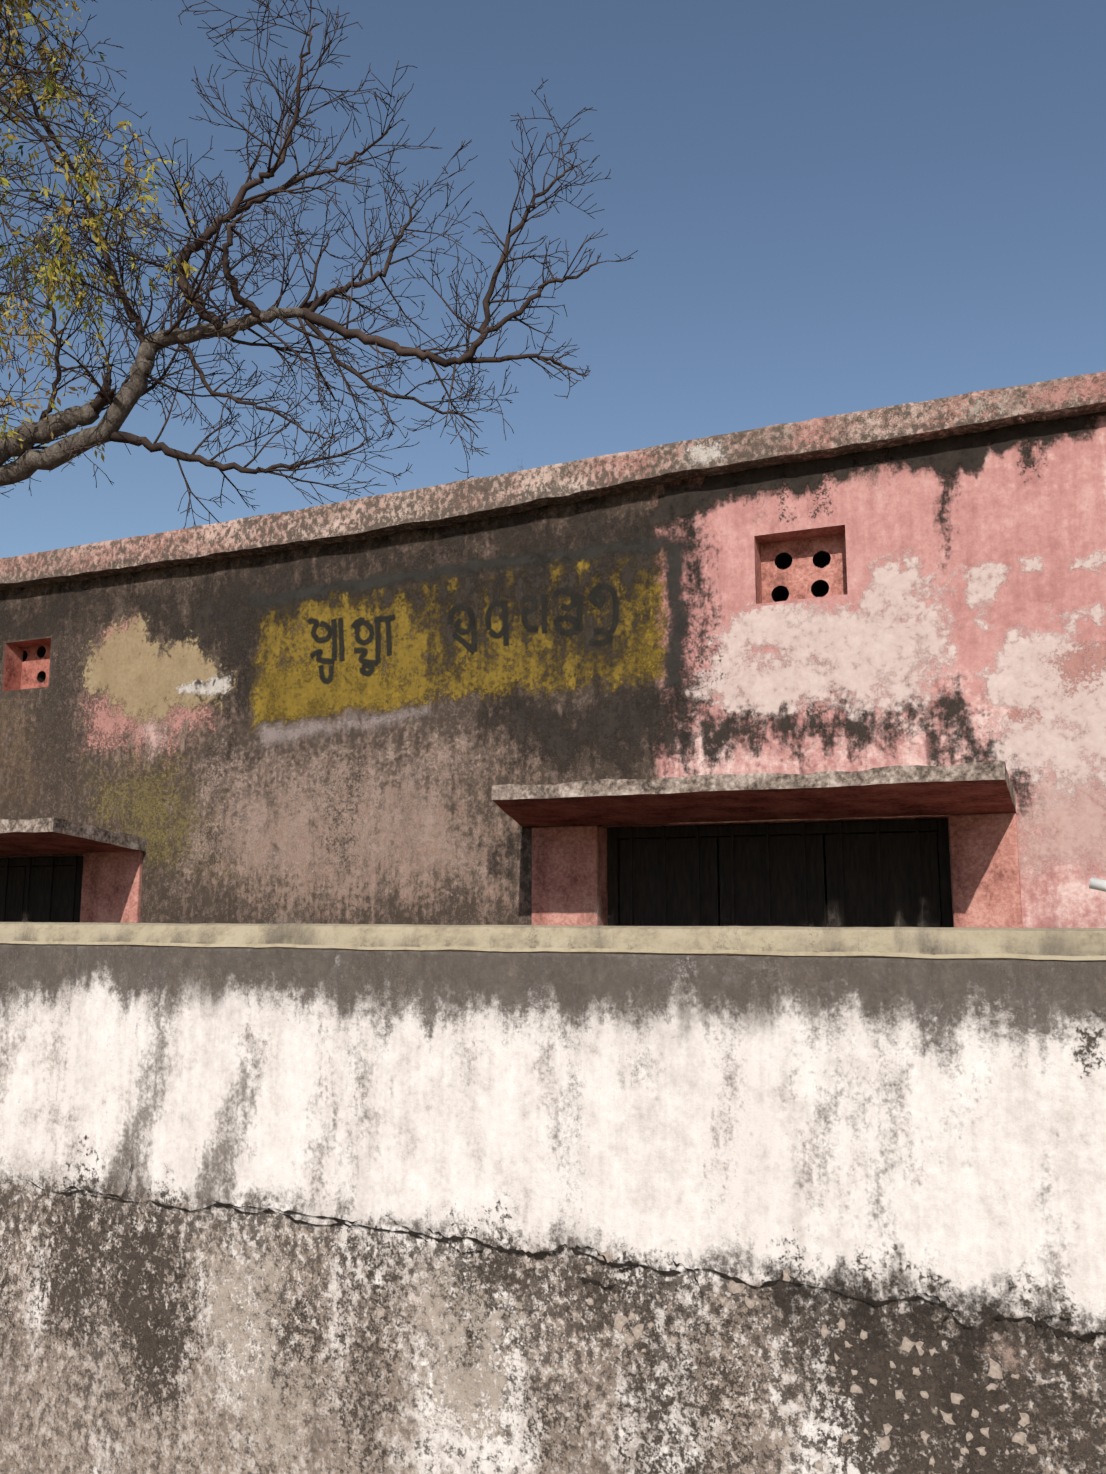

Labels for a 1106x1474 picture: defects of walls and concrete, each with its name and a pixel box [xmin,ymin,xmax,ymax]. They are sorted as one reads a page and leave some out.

flaking render [77,613,237,770]
leakage [0,411,1106,892]
flaking render [685,552,958,720]
flaking render [977,603,1106,875]
leakage [1006,938,1106,1078]
leakage [0,936,224,1431]
leakage [262,1215,416,1473]
crack [2,1164,1106,1342]
leakage [431,1201,1106,1474]
flaking render [821,1318,877,1393]
flaking render [841,1309,989,1456]
flaking render [985,1346,1042,1455]